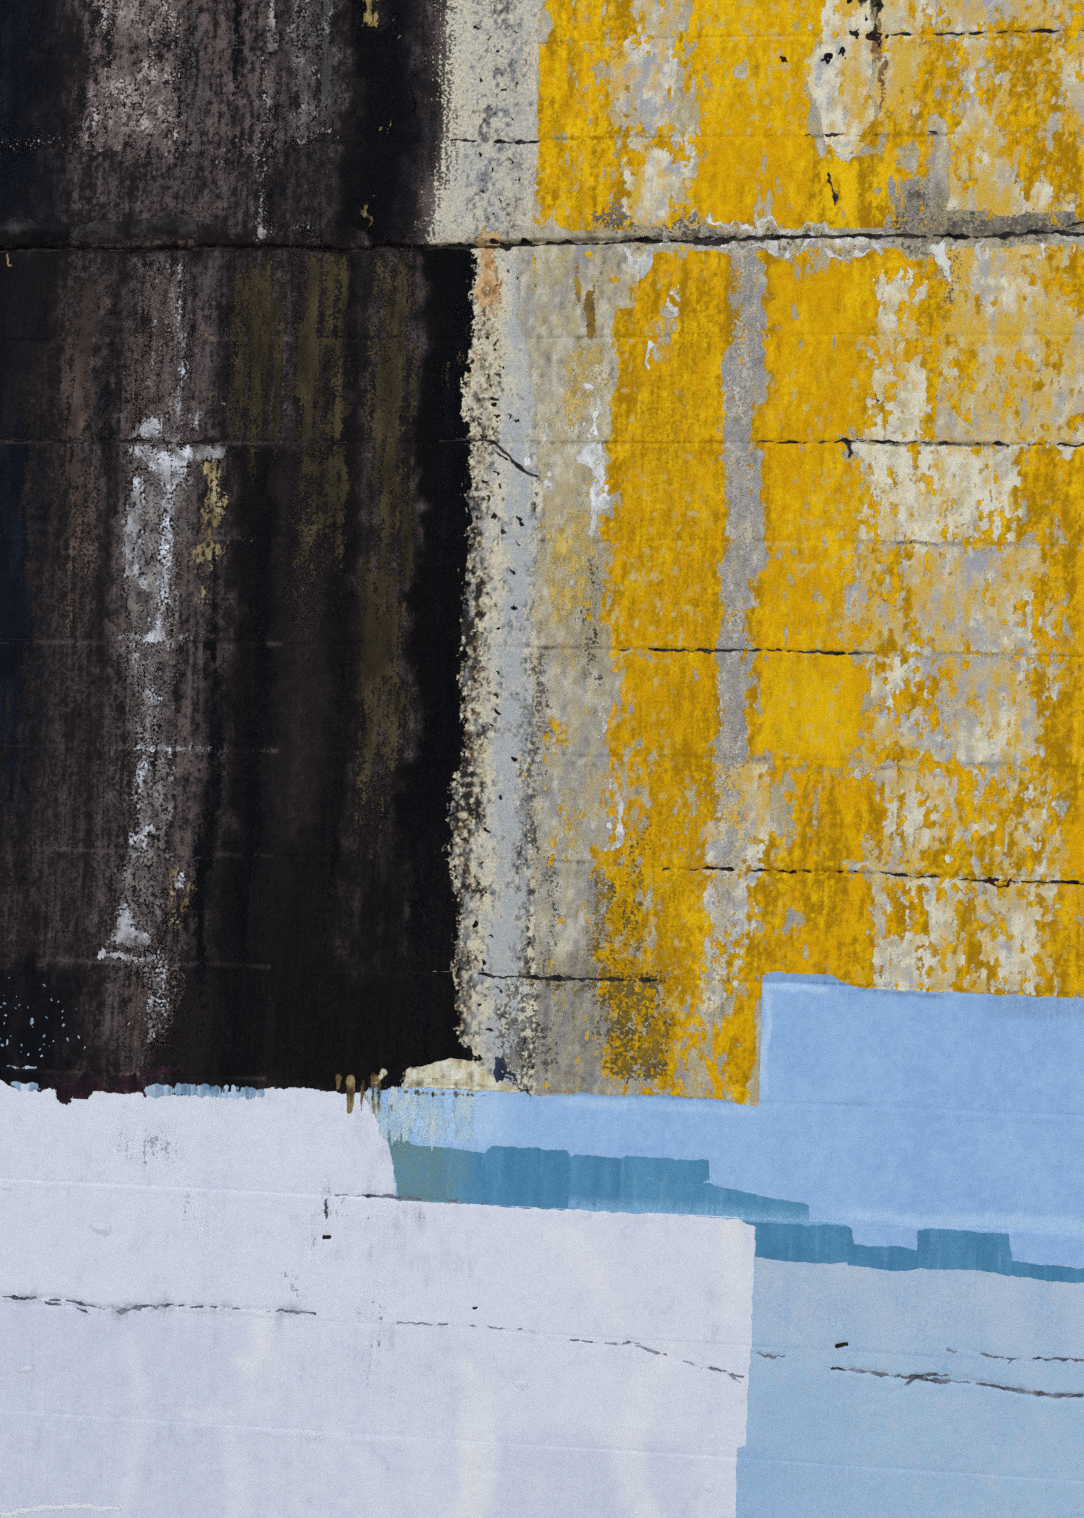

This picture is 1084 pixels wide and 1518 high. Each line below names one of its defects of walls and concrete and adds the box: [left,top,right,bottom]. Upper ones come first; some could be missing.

crack [0,133,1084,254]
peeling [609,0,703,229]
peeling [780,0,1084,217]
leakage [0,0,676,1151]
spalling [403,0,610,1094]
peeling [841,244,1084,996]
peeling [604,775,624,852]
peeling [699,763,772,1021]
crack [2,1295,316,1315]
crack [397,1322,523,1330]
crack [570,1339,785,1383]
crack [831,1348,1084,1398]